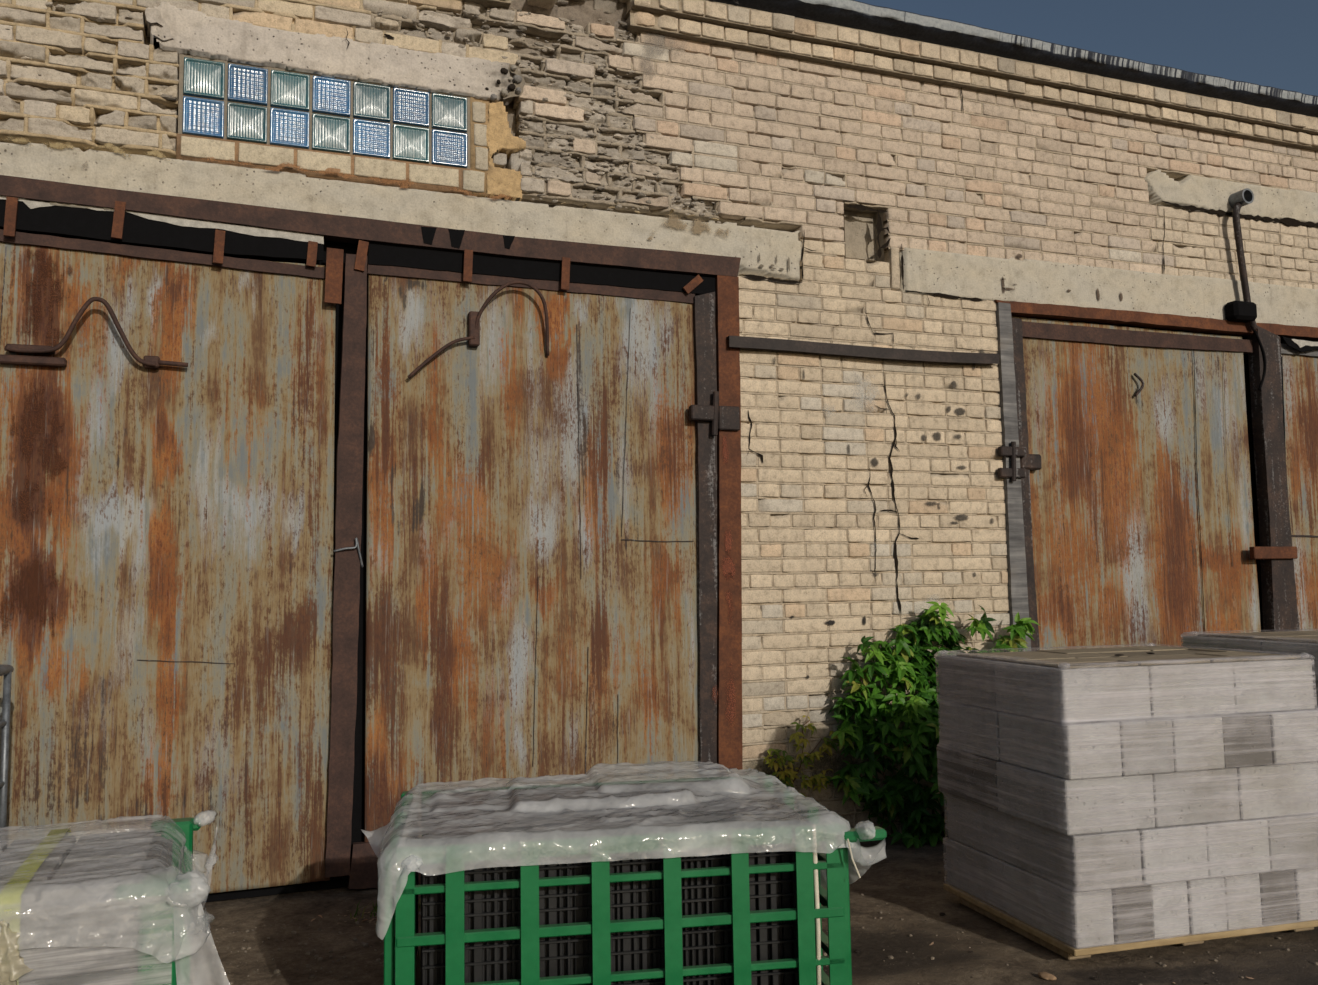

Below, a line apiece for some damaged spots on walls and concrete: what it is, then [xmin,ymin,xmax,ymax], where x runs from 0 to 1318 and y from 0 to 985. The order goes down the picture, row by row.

spalling [315,1,728,236]
corrosion [23,248,73,345]
corrosion [10,379,69,521]
crack [864,372,919,619]
corrosion [0,558,61,635]